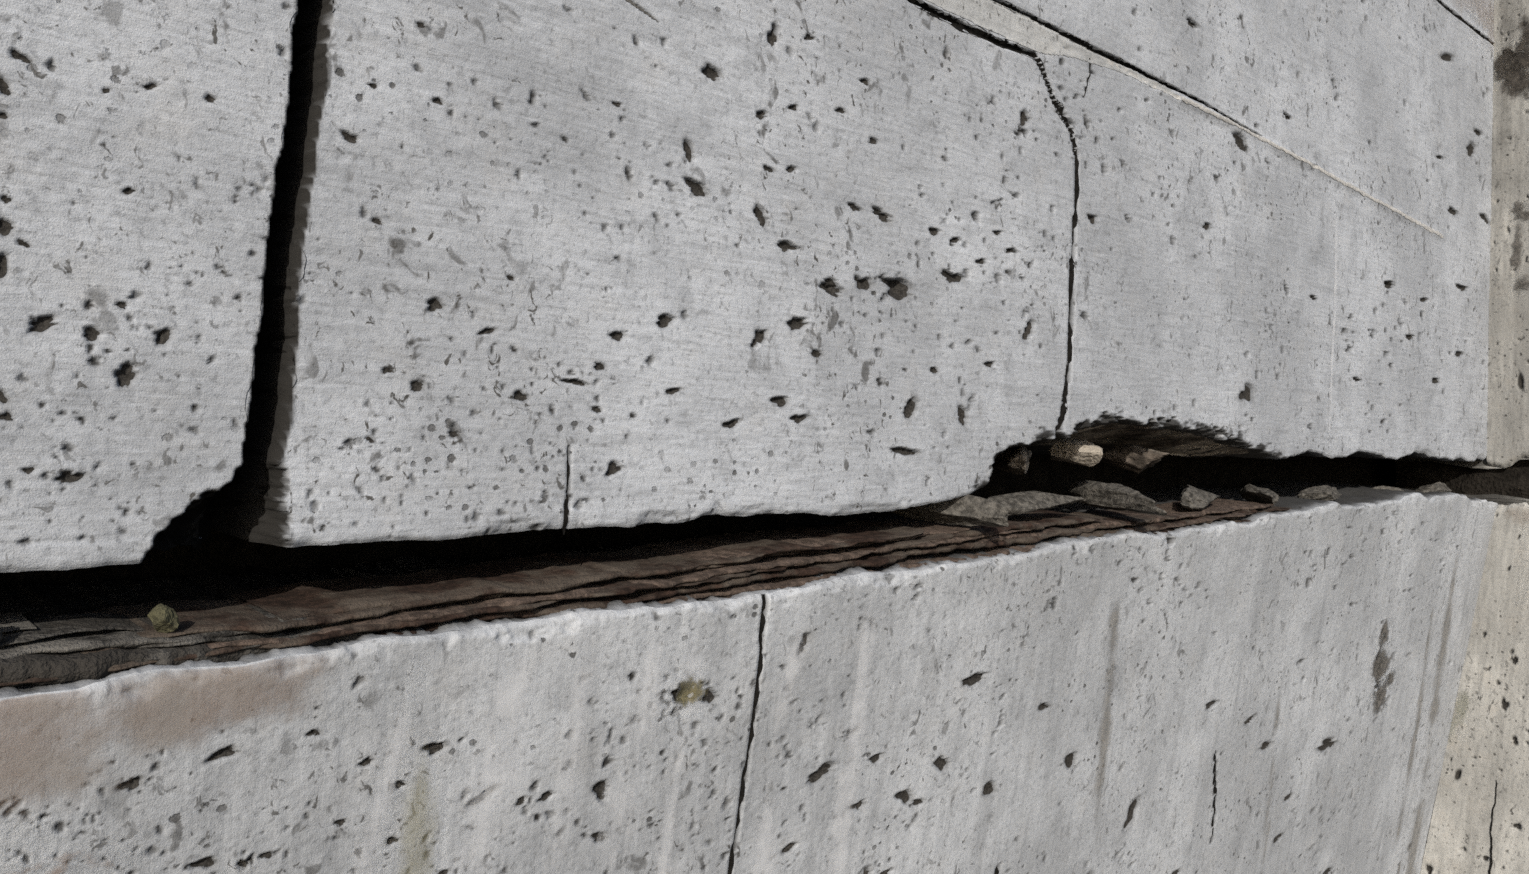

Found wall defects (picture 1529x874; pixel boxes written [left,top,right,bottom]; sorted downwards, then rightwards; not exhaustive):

crack [1436,0,1517,54]
crack [156,0,335,551]
crack [907,0,1258,432]
spalling [1032,423,1250,456]
crack [728,595,766,874]